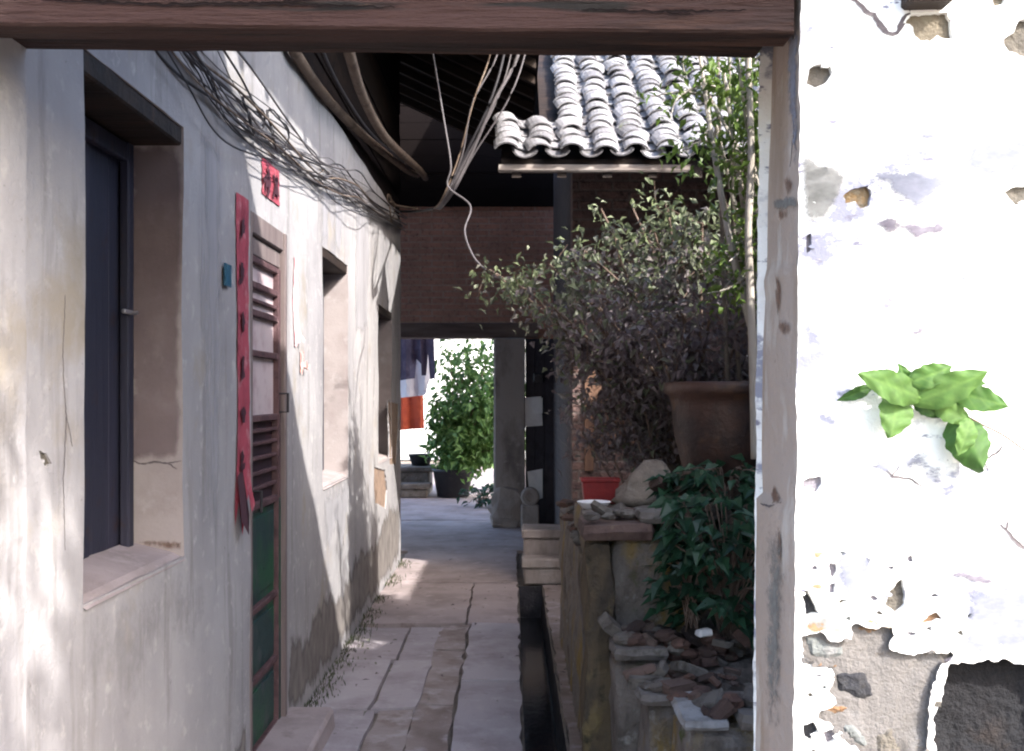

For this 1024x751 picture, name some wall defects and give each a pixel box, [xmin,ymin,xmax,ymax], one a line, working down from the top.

crack [852,0,911,36]
spalling [906,12,954,47]
spalling [1004,18,1024,57]
spalling [806,62,833,88]
spalling [843,186,873,208]
spalling [1004,186,1024,205]
spalling [39,451,52,467]
crack [134,461,180,469]
spalling [811,551,847,604]
water stain [288,506,399,707]
spalling [798,566,954,751]